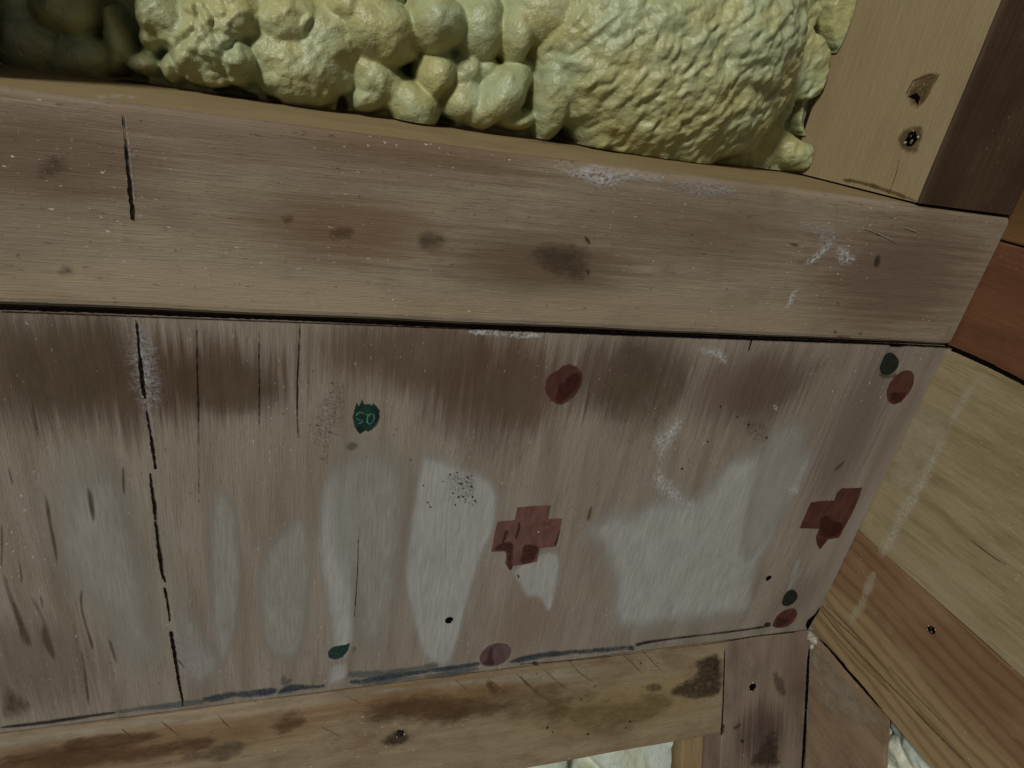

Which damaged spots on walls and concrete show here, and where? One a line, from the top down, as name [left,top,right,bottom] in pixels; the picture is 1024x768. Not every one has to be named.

crack [112,117,135,220]
crack [135,319,184,706]
water stain [673,655,721,698]
water stain [377,700,488,720]
water stain [386,731,407,744]